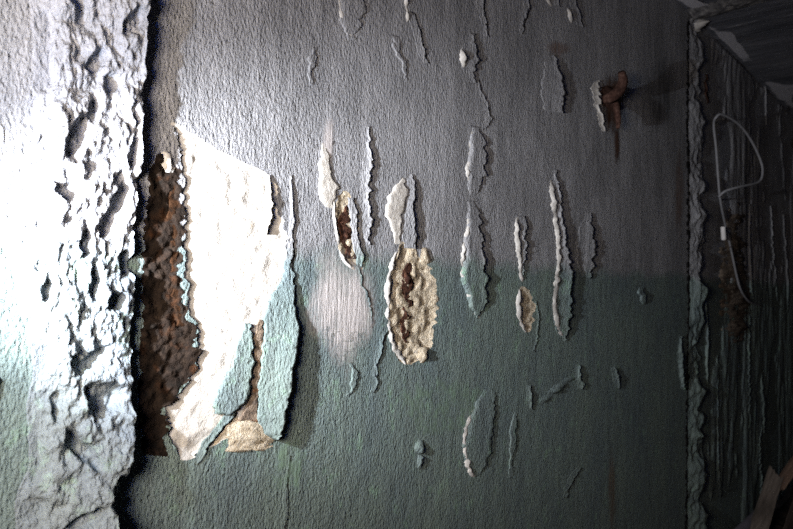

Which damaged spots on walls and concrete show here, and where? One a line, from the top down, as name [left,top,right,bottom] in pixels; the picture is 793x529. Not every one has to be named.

spalling [137,123,300,464]
spalling [318,126,374,270]
spalling [384,174,439,365]
spalling [514,215,540,352]
rust [603,97,621,159]
peeling [704,27,793,522]